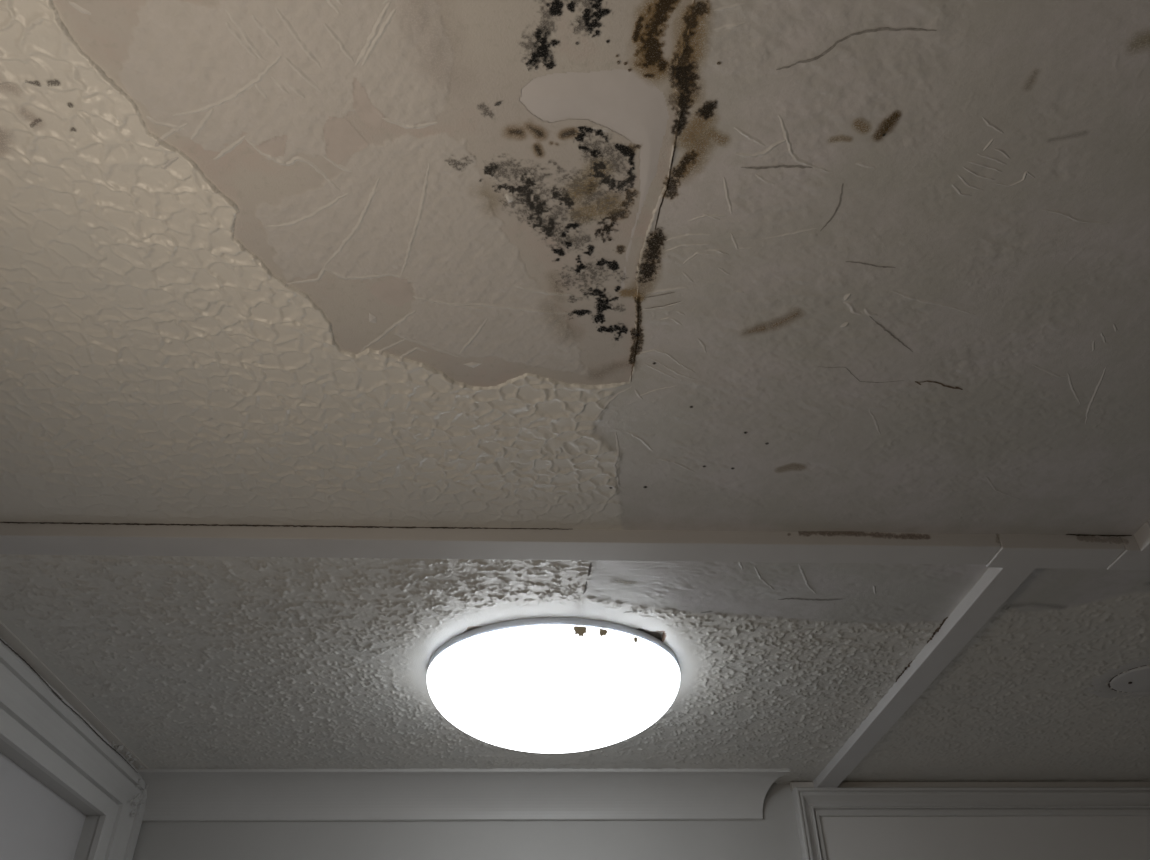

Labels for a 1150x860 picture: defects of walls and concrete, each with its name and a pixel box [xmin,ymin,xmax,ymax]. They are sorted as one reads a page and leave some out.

peeling [53,0,693,387]
damp [520,0,610,71]
damp [480,126,665,341]
crack [654,120,680,234]
damp [616,0,728,199]
crack [631,290,681,381]